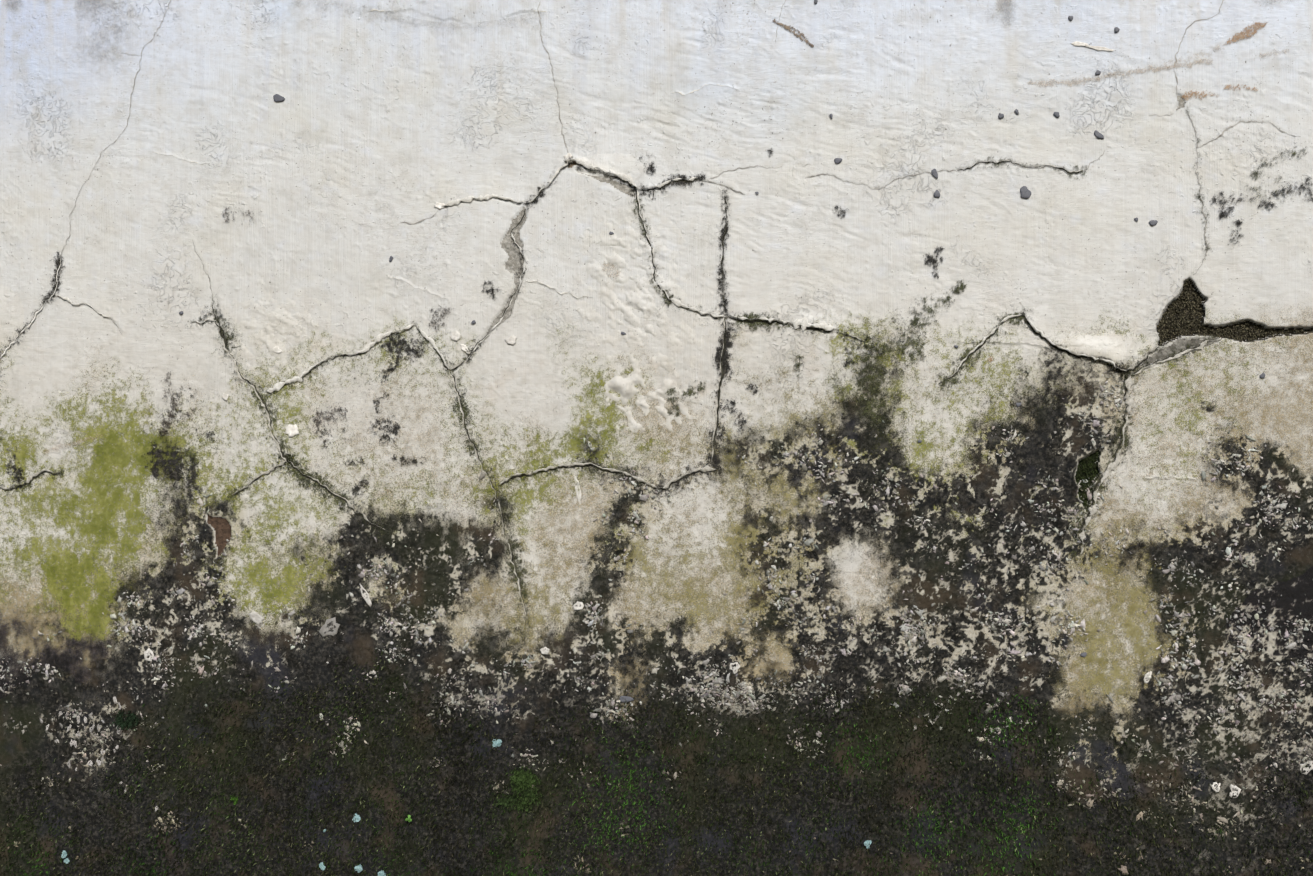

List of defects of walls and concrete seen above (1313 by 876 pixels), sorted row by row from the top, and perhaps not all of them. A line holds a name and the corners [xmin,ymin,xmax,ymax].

crack [0,469,64,493]
crack [0,0,171,387]
crack [187,2,1104,635]
damp [0,280,1313,876]
damp [923,247,944,277]
crack [935,308,1221,557]
spalling [1141,279,1313,366]